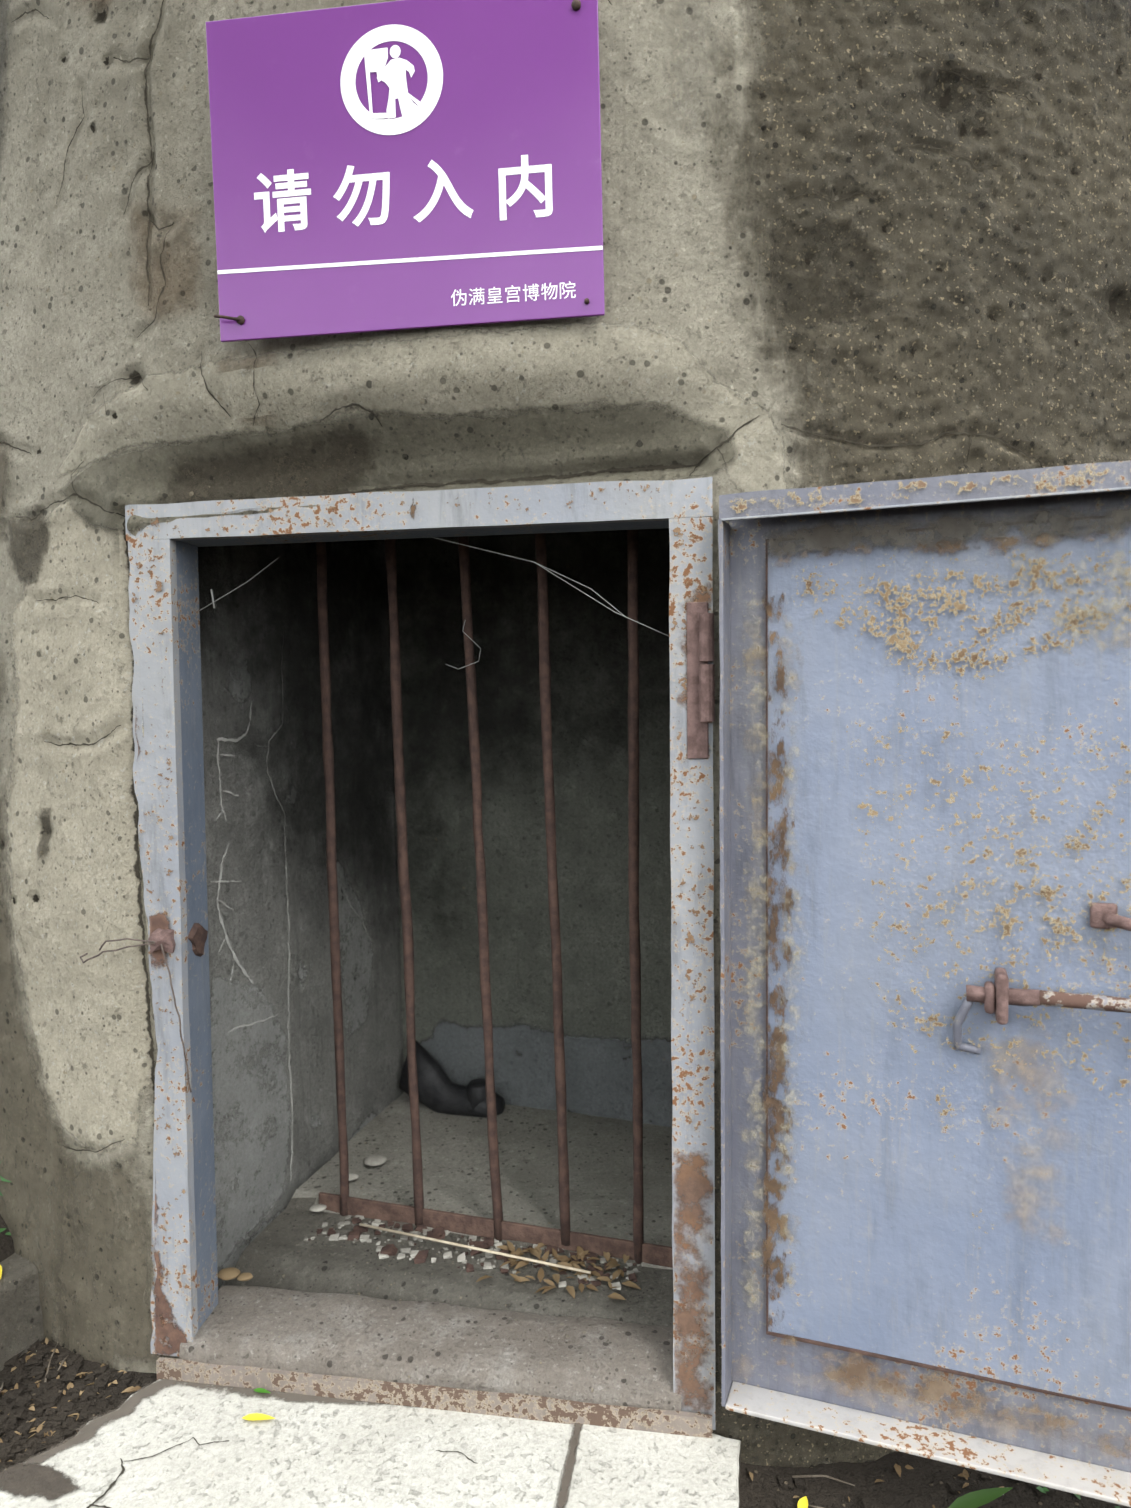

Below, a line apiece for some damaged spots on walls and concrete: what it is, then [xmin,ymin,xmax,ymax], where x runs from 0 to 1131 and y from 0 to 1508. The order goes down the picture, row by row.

crack [56,88,85,204]
crack [113,0,174,338]
leakage [732,0,1131,487]
crack [320,403,382,426]
crack [308,416,1043,496]
corrosion [672,527,712,739]
corrosion [146,859,178,981]
corrosion [729,464,1131,1326]
corrosion [154,1175,188,1356]
corrosion [674,1111,714,1410]
leakage [712,1061,899,1468]
crack [86,1437,229,1508]